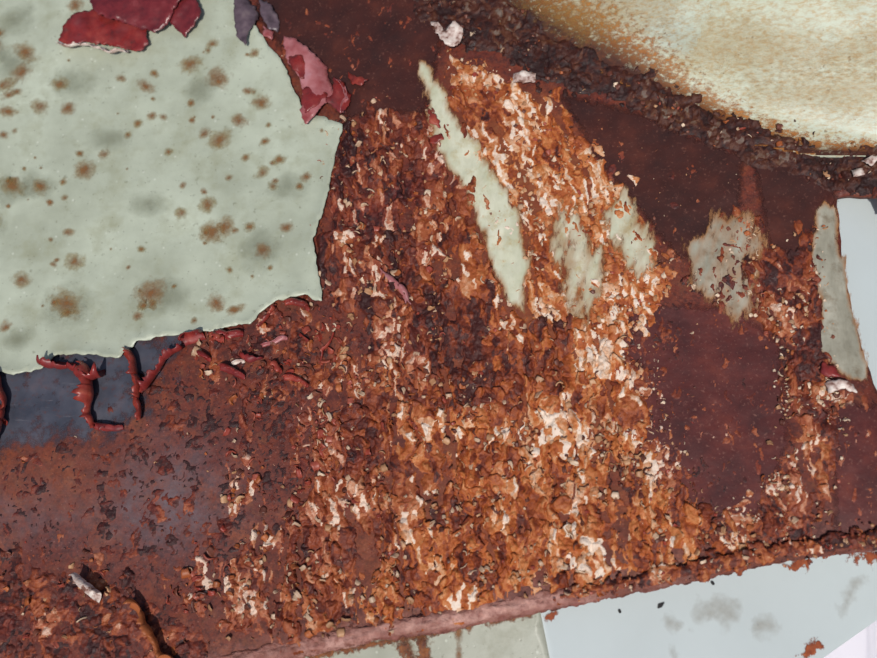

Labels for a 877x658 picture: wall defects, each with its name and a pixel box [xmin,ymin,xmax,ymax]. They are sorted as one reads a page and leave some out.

corrosion [0,47,32,97]
corrosion [500,0,877,156]
peeling [0,0,368,450]
corrosion [203,220,253,244]
peeling [417,60,532,312]
peeling [547,186,656,326]
peeling [687,209,767,323]
peeling [811,200,868,394]
peeling [848,155,877,180]
corrosion [81,433,202,593]
corrosion [0,536,215,658]
corrosion [304,629,439,658]